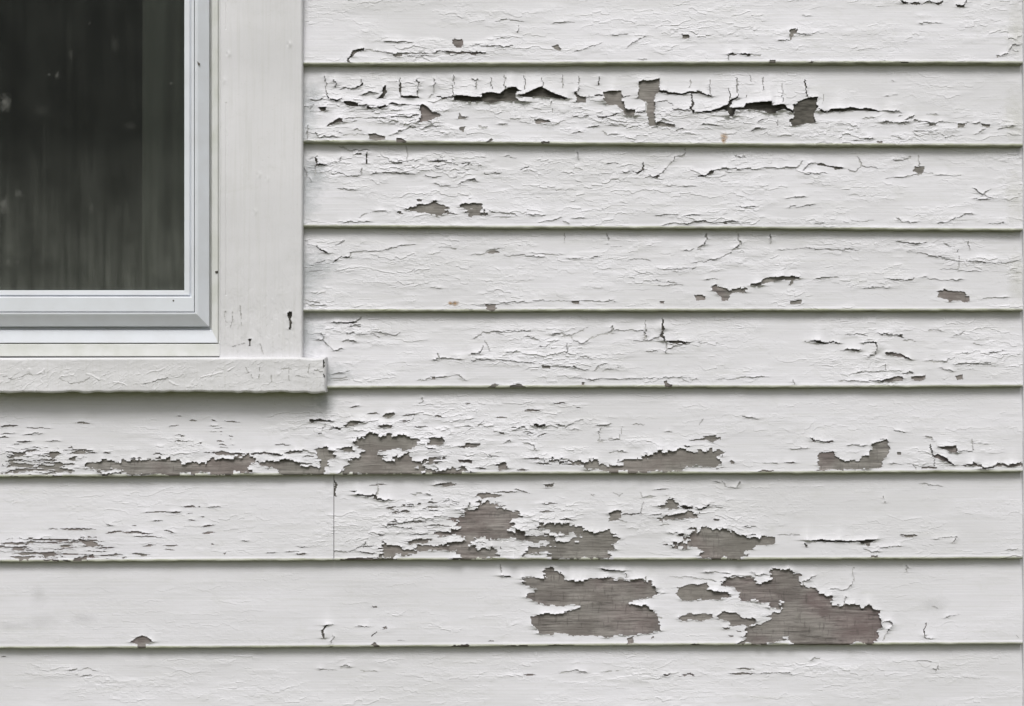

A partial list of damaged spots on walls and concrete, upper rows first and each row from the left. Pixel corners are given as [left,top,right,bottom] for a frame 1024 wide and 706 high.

crack [900,0,967,8]
peeling [304,71,823,191]
crack [373,147,529,187]
crack [308,210,416,272]
peeling [396,196,491,217]
crack [451,206,755,283]
crack [606,148,1021,289]
peeling [694,264,804,301]
peeling [936,286,969,302]
crack [433,318,700,364]
peeling [758,429,1022,472]
peeling [0,395,902,646]